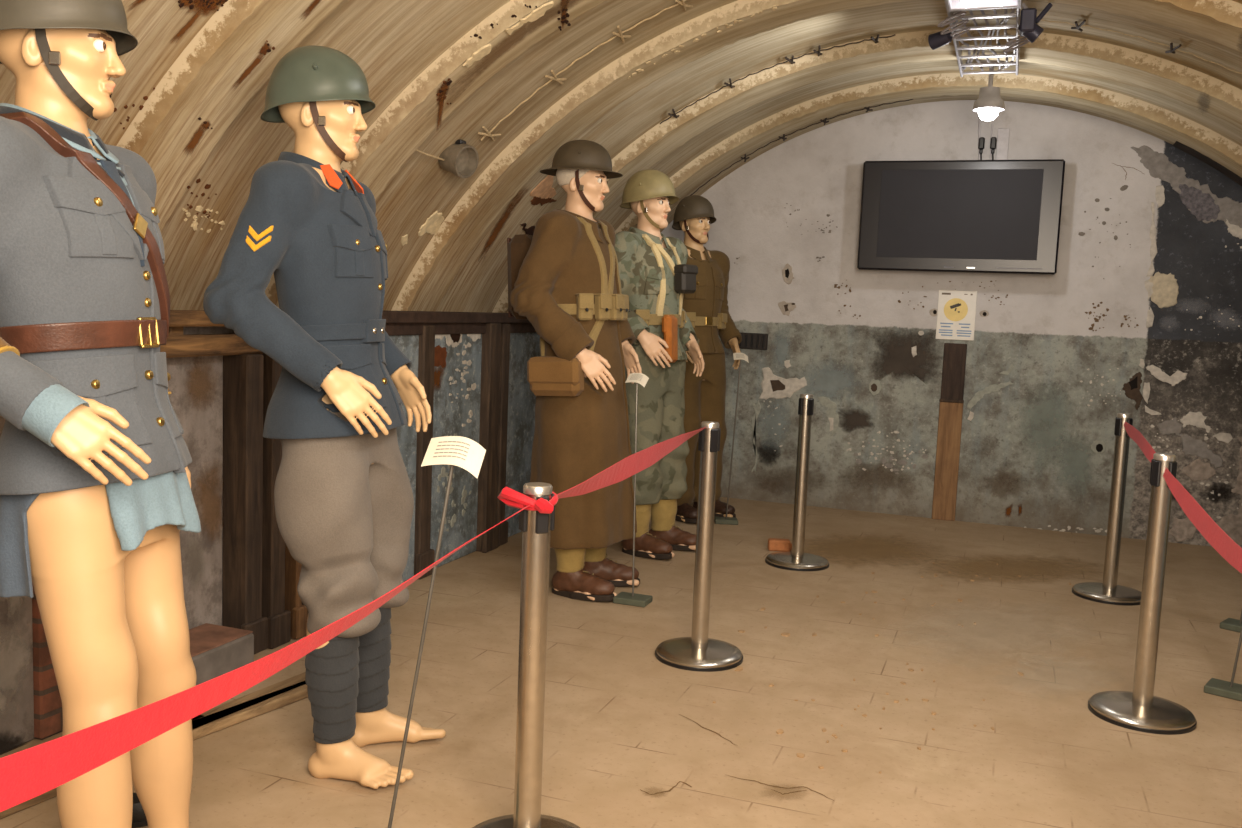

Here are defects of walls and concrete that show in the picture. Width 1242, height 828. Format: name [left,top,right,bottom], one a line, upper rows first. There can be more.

peeling [1131,145,1242,277]
peeling [1085,302,1109,331]
peeling [1120,307,1154,328]
peeling [869,331,942,396]
spalling [752,360,807,472]
peeling [818,396,929,474]